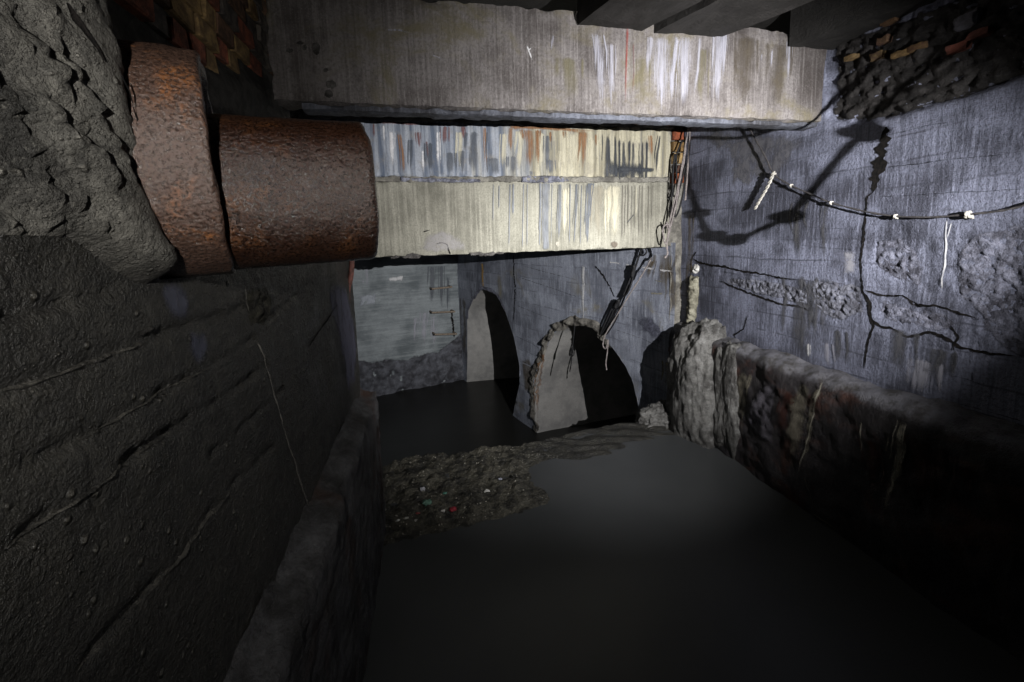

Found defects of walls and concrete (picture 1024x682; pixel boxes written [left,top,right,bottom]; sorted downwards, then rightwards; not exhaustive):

leakage [564,35,616,84]
spalling [834,0,1024,121]
leakage [407,131,523,171]
leakage [493,133,660,249]
crack [690,252,809,337]
spalling [722,278,863,320]
spalling [877,238,923,285]
crack [803,122,1020,421]
spalling [958,225,1024,358]
spalling [529,315,611,432]